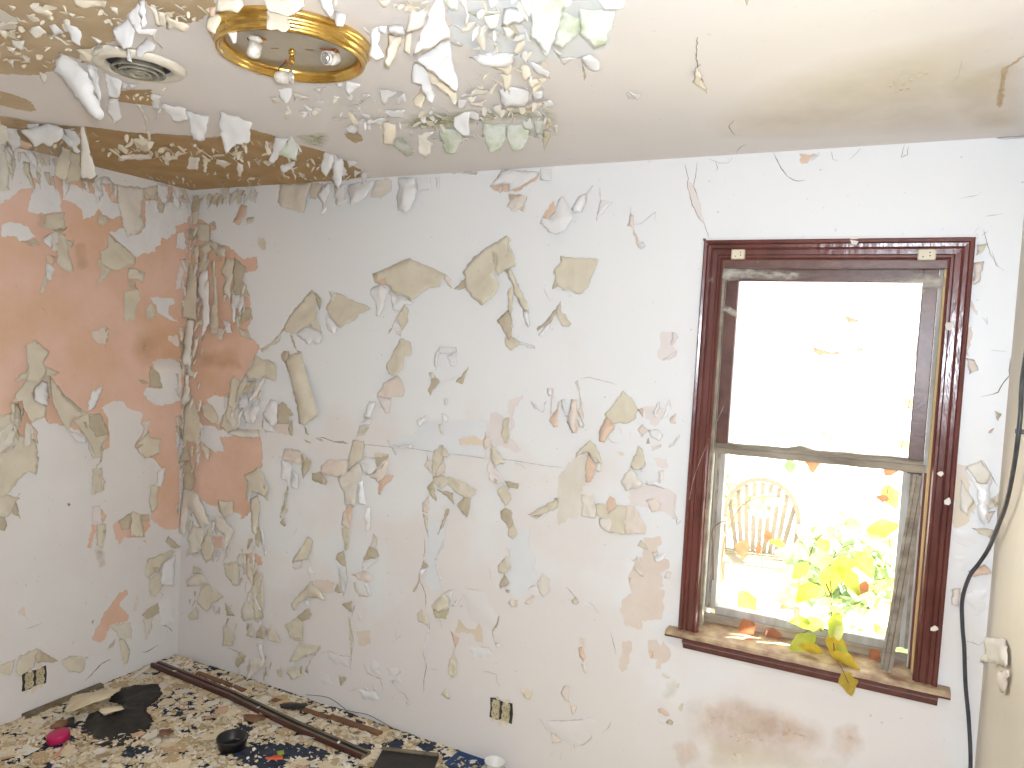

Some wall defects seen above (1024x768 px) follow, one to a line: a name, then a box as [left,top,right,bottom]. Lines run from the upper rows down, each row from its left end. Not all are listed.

crack [685,159,718,234]
peeling [973,229,997,285]
flaking render [0,0,625,681]
peeling [966,327,979,374]
crack [305,436,347,444]
crack [374,440,562,468]
peeling [483,377,680,607]
peeling [937,460,999,617]